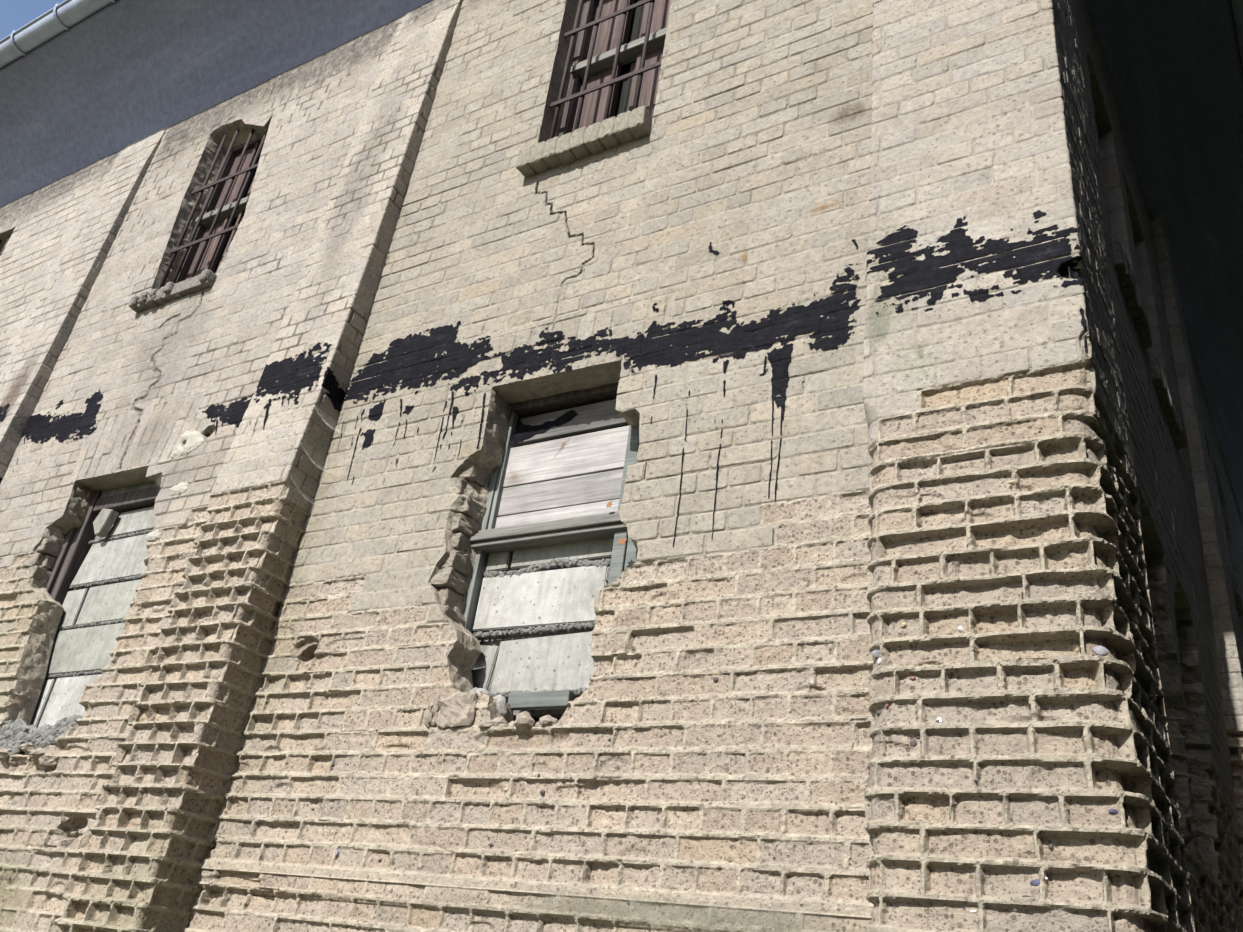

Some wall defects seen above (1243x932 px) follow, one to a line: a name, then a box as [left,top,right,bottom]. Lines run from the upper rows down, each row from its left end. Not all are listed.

crack [535,183,595,274]
crack [120,293,204,469]
spalling [0,361,1243,932]